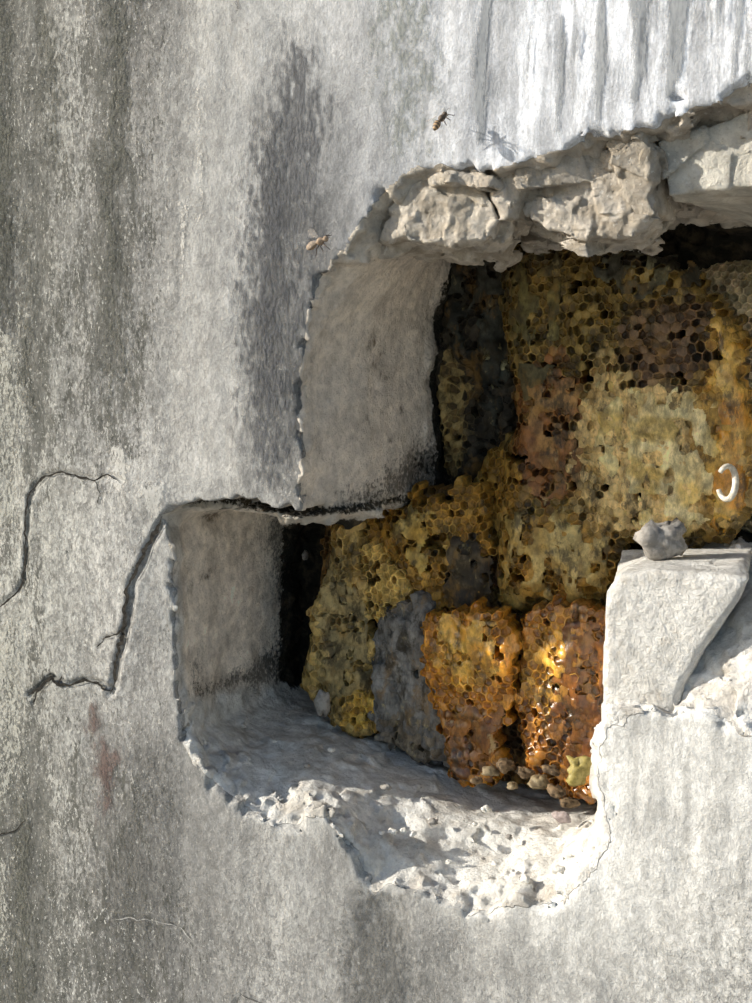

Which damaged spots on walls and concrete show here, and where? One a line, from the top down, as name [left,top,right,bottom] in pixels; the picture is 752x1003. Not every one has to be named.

leakage [471,0,499,145]
leakage [554,15,579,132]
leakage [574,0,607,138]
leakage [629,0,752,103]
leakage [234,40,339,493]
crack [0,471,120,607]
peeling [108,446,131,492]
spalling [137,83,752,917]
crack [28,517,162,703]